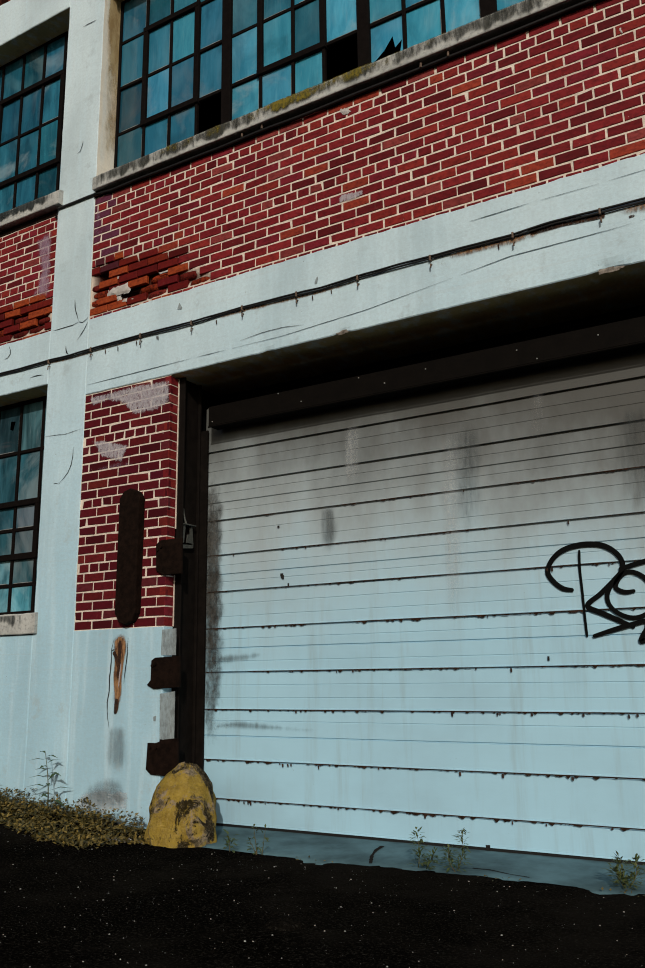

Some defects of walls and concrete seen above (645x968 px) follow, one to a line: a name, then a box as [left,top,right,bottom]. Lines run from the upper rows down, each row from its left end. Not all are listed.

spalling [92,270,210,308]
spalling [0,316,51,339]
rust [247,664,645,673]
rust [107,636,128,726]
rust [406,711,645,719]
rust [206,759,645,781]
rust [216,798,645,831]